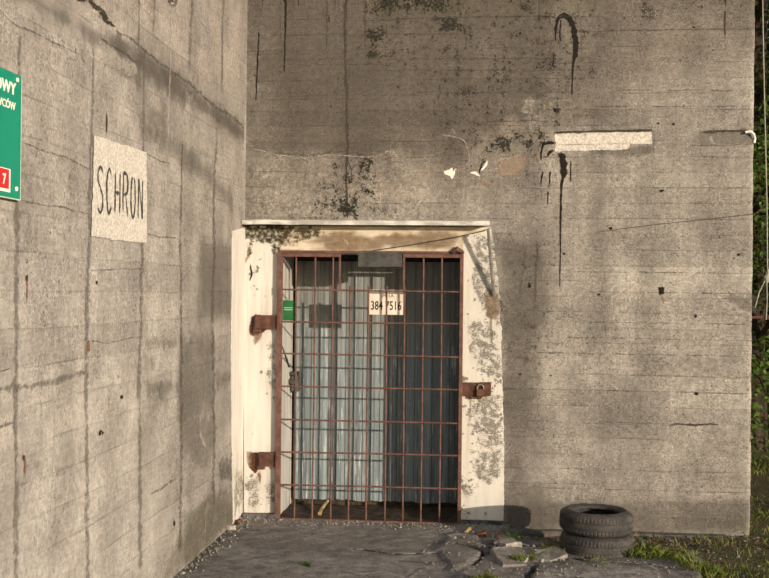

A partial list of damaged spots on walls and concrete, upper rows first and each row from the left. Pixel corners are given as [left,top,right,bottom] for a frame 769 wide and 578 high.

crack [78,0,136,63]
damp [354,0,617,370]
rust [249,314,266,344]
peeling [467,235,505,381]
rust [247,452,261,483]
peeling [463,395,506,498]